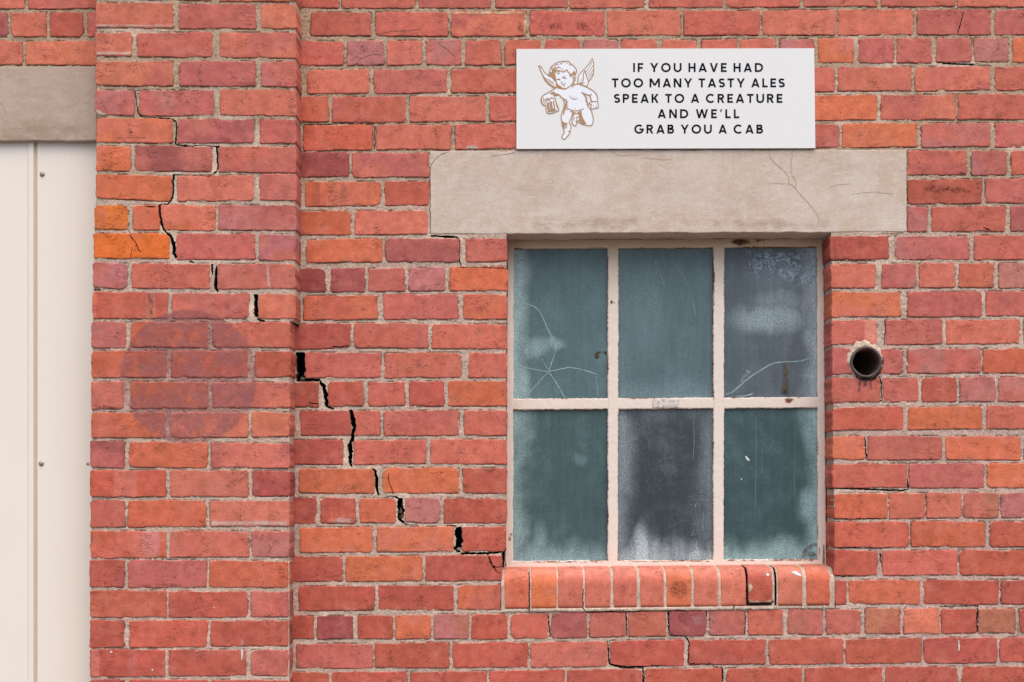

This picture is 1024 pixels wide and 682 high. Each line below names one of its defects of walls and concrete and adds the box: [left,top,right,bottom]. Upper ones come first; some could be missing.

crack [135,90,220,292]
crack [308,123,375,149]
crack [425,151,507,269]
crack [254,294,265,322]
crack [291,322,417,525]
crack [447,525,506,574]